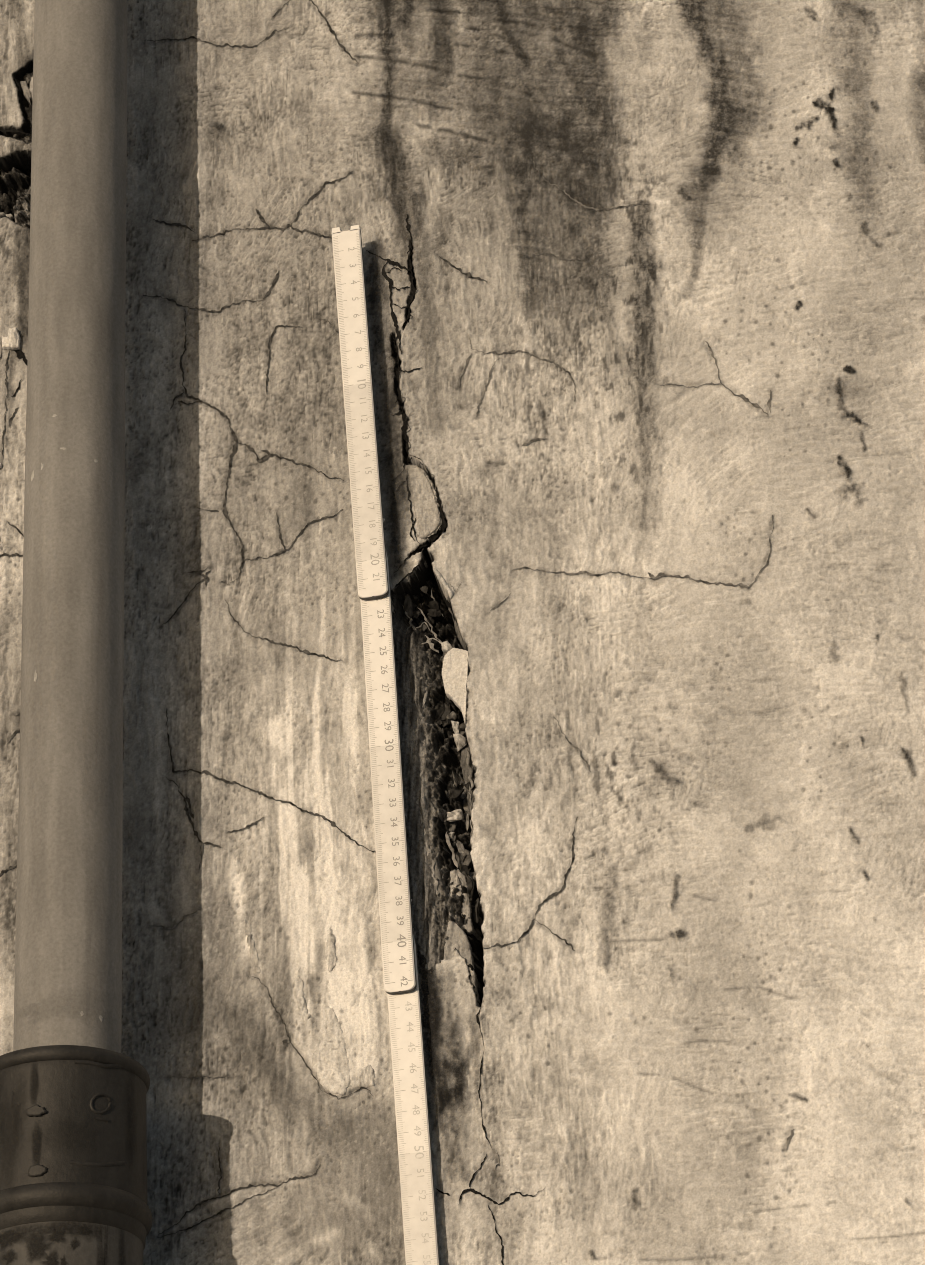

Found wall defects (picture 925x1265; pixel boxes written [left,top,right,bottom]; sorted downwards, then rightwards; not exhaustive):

spalling [3,72,33,143]
water stain [368,0,422,240]
water stain [563,2,619,176]
water stain [678,0,759,258]
crack [143,271,344,661]
water stain [384,359,409,577]
crack [366,214,487,587]
water stain [630,200,662,389]
crack [166,710,376,869]
spalling [392,467,485,1007]
crack [486,817,578,951]
crack [437,1008,545,1265]